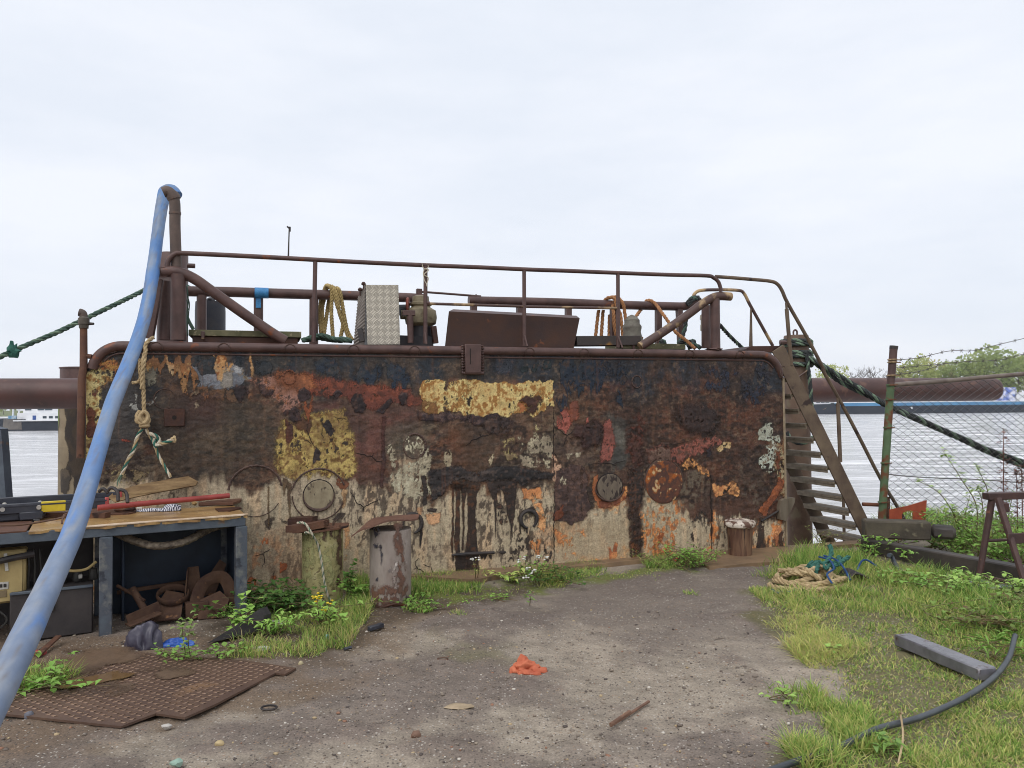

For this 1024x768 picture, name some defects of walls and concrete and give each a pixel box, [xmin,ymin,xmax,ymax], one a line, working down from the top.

peeling [190,364,589,501]
peeling [600,419,615,463]
peeling [758,423,780,473]
corrosion [682,458,740,497]
corrosion [759,439,785,546]
damp [421,475,554,571]
corrosion [641,505,677,556]